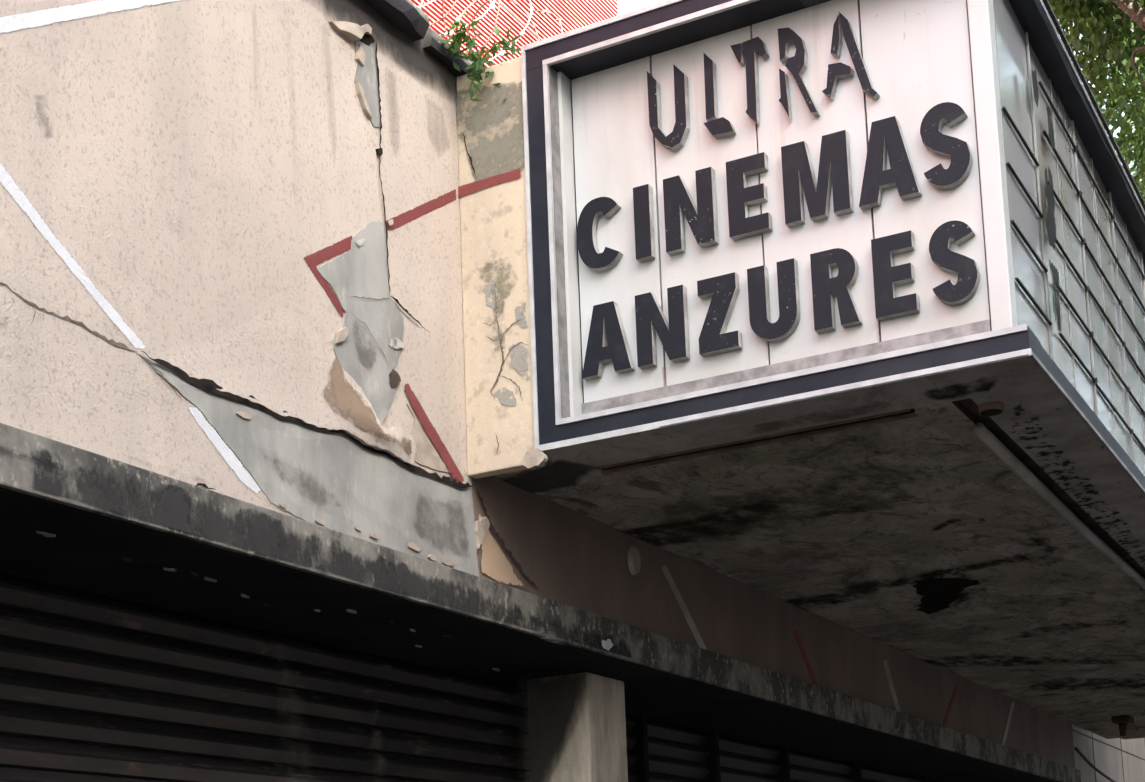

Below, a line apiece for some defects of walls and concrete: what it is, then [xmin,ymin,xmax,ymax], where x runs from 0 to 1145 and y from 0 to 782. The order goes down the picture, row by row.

flaking render [328,21,380,127]
flaking render [514,302,527,328]
flaking render [508,343,530,380]
flaking render [139,219,479,577]
water stain [324,357,412,454]
flaking render [494,387,516,406]
water stain [927,380,995,400]
crack [0,280,539,591]
water stain [617,500,776,546]
water stain [23,449,631,658]
water stain [787,555,1027,611]
water stain [1032,678,1145,691]